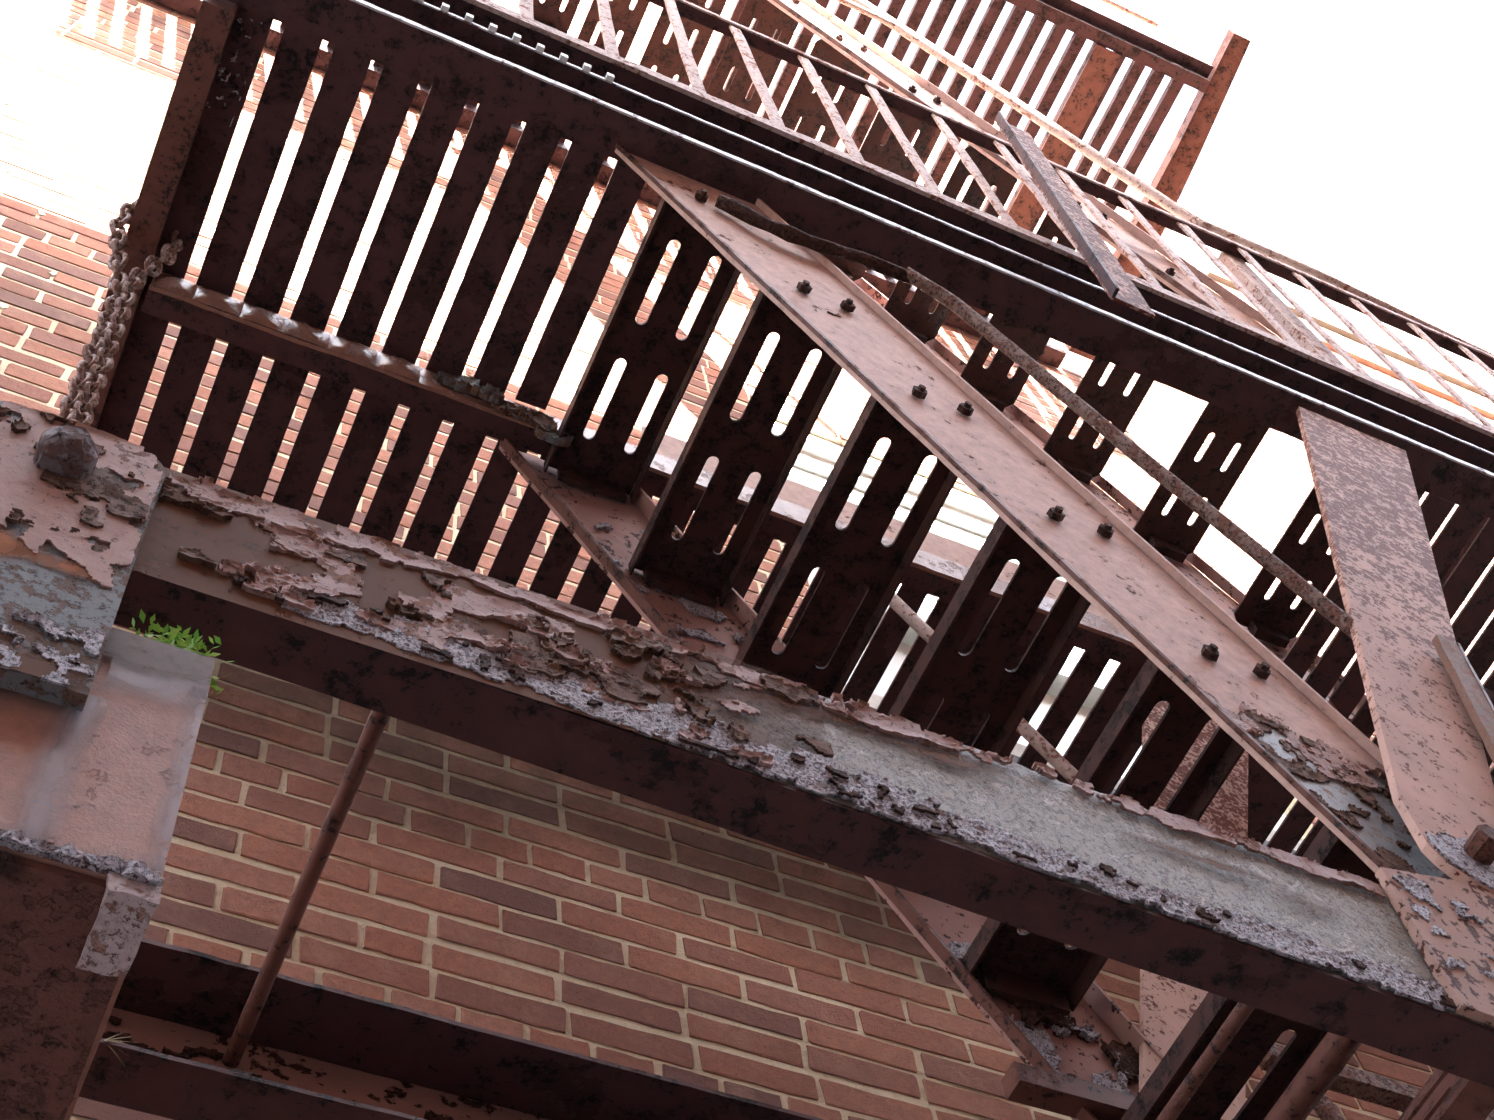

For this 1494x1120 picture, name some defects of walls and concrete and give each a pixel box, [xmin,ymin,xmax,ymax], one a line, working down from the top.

peeling [0,401,1494,1011]
peeling [948,940,1139,1095]